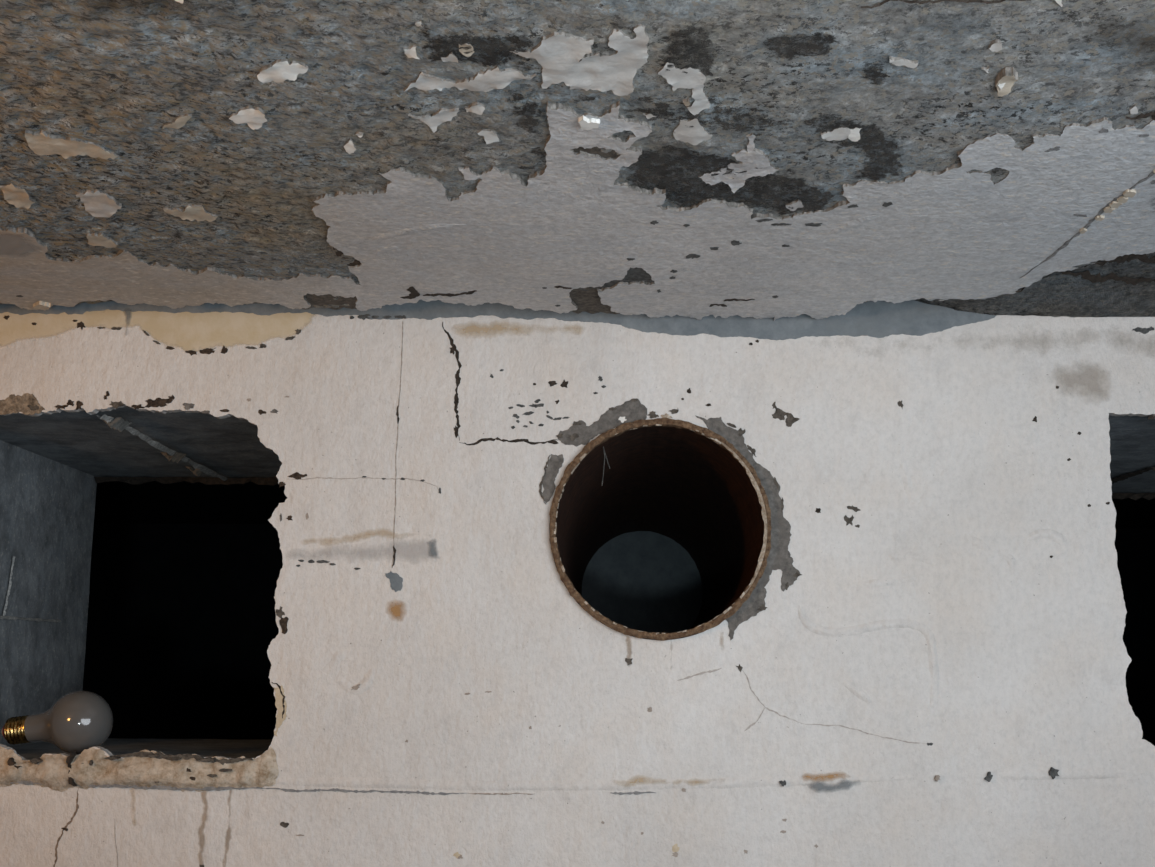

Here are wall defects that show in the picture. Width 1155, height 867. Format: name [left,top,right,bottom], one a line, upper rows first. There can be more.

crack [1126,112,1155,120]
peeling [0,24,1155,356]
crack [1020,169,1155,278]
crack [293,286,558,592]
peeling [508,380,691,504]
peeling [695,402,802,641]
spalling [0,682,287,792]
crack [53,788,79,867]